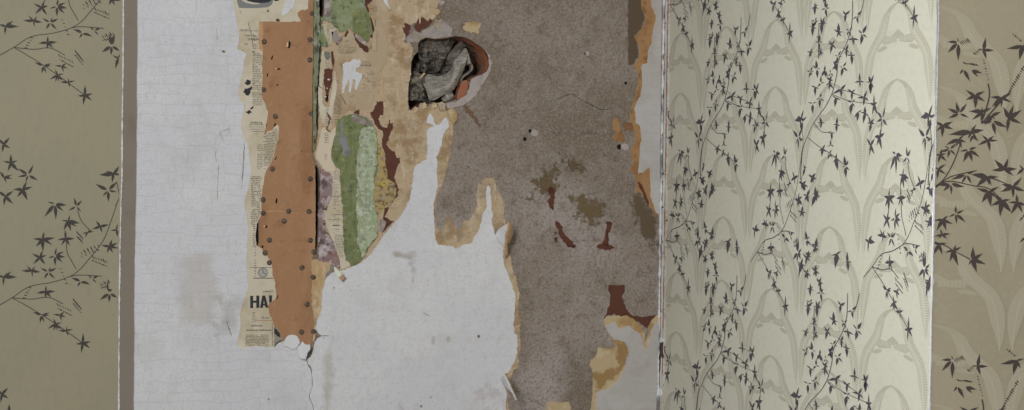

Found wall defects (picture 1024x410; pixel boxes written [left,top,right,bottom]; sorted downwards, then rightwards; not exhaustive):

peeling [320,0,375,67]
spalling [404,18,492,110]
peeling [317,110,397,277]